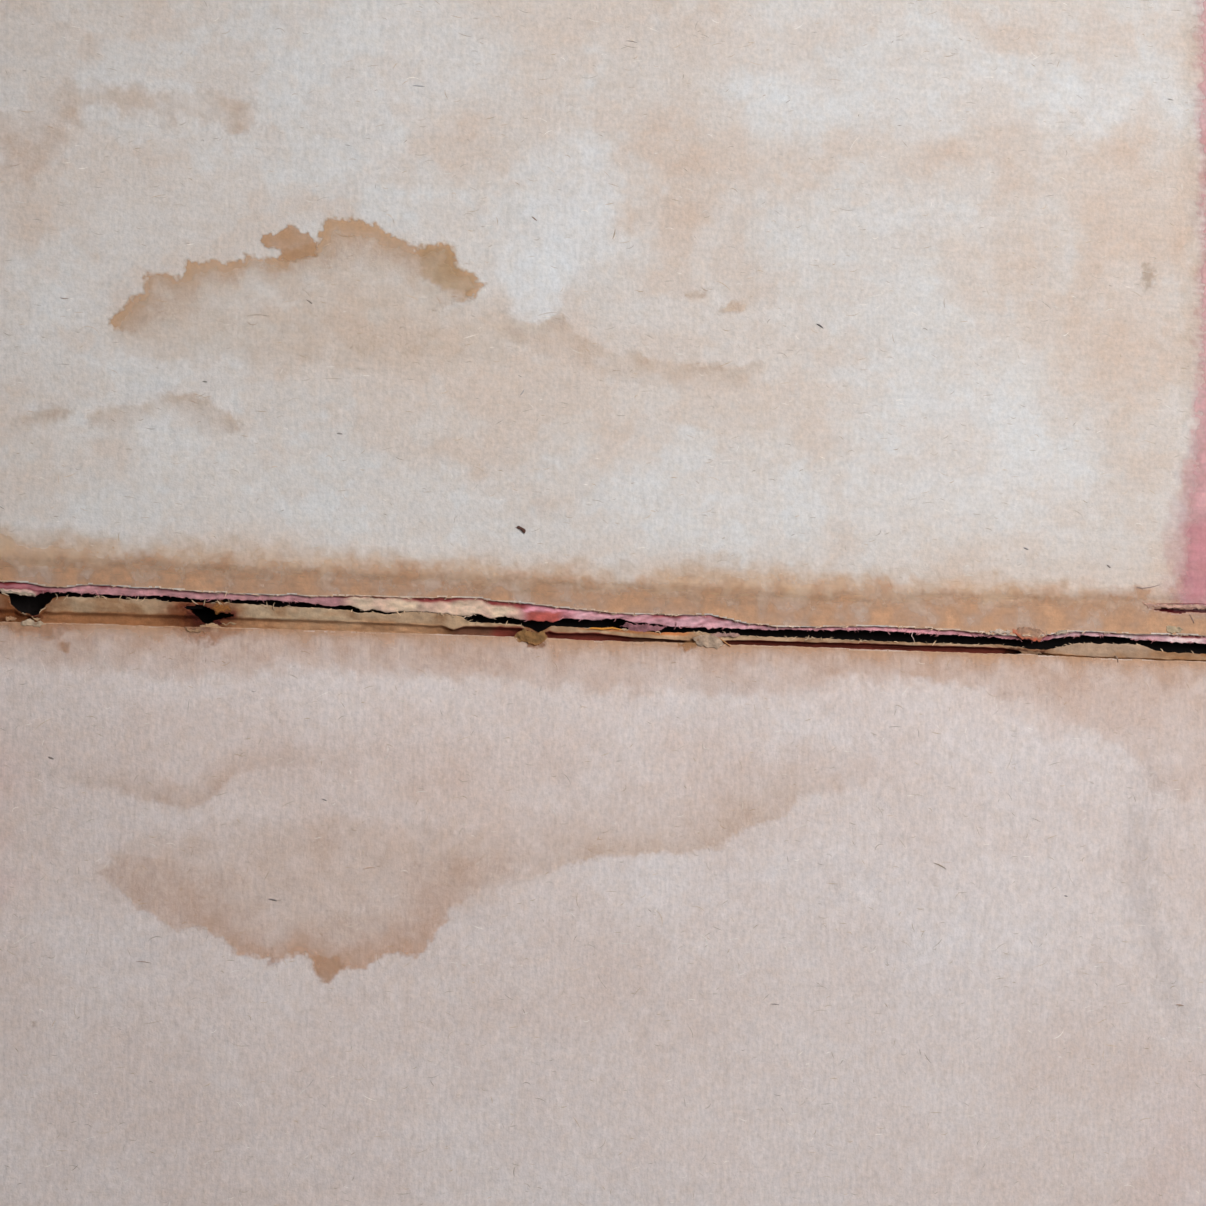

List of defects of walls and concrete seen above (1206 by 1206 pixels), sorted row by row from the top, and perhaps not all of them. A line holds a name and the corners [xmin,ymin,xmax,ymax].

damp [163,219,483,296]
damp [1182,265,1206,606]
crack [0,581,1206,654]